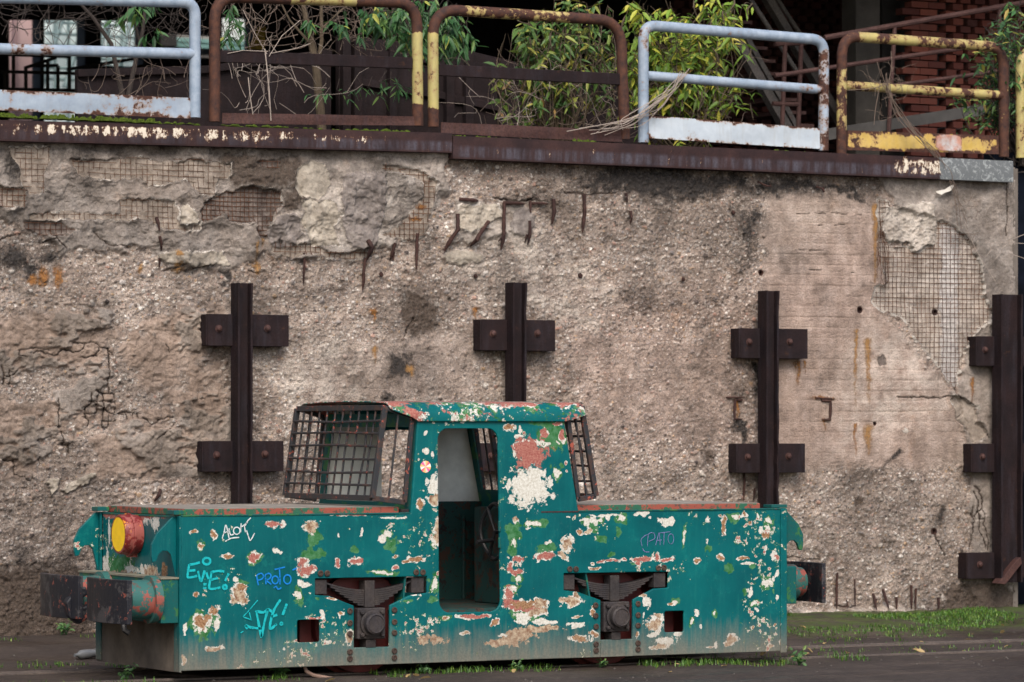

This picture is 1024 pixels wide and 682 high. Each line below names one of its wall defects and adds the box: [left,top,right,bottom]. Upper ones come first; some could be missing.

spalling [0,144,440,290]
corrosion [27,267,63,286]
spalling [871,185,992,444]
crack [1,341,174,453]
corrosion [854,330,871,397]
corrosion [853,423,873,453]
crack [969,485,989,550]